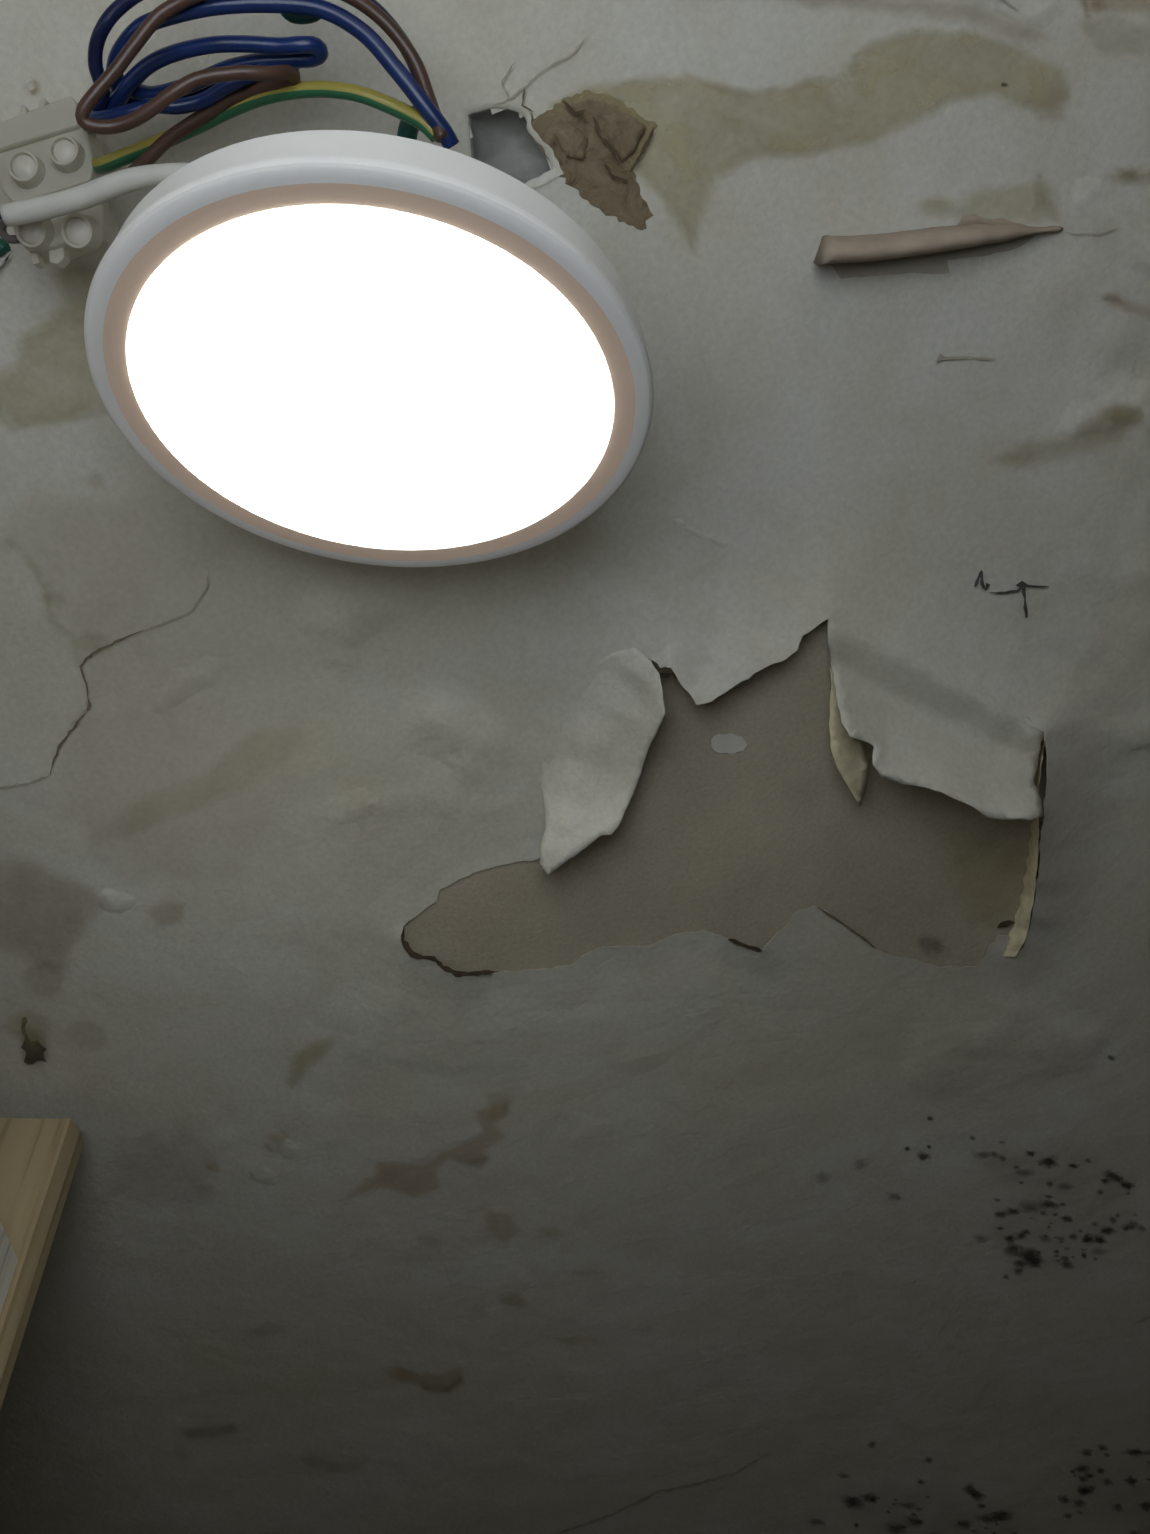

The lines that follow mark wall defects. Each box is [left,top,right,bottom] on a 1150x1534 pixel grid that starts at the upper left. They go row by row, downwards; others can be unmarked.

spalling [531,90,658,231]
peeling [814,214,1063,279]
crack [0,569,209,788]
peeling [343,493,1150,1024]
water stain [998,1152,1133,1278]